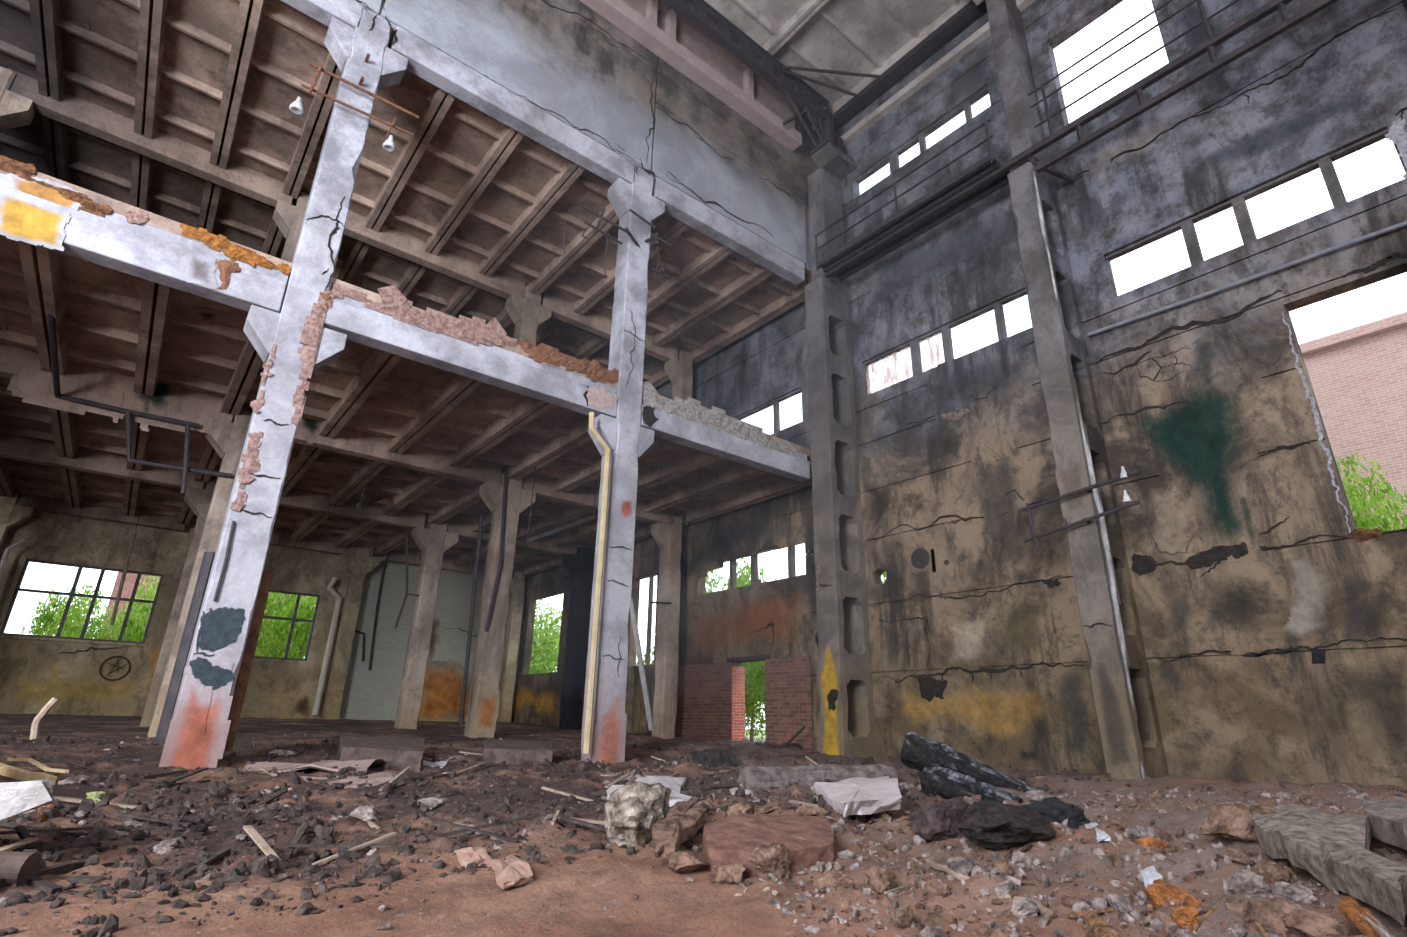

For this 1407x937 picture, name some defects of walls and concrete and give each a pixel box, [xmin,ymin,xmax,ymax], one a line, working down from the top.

crack [355,0,402,45]
crack [437,0,772,236]
corrosion [0,173,85,251]
corrosion [216,259,241,289]
leakage [1031,168,1060,309]
spalling [250,344,277,413]
spalling [291,282,619,425]
spalling [642,381,797,457]
crack [1095,290,1282,420]
leakage [892,341,1146,780]
leakage [1138,345,1407,777]
corrosion [159,662,234,769]